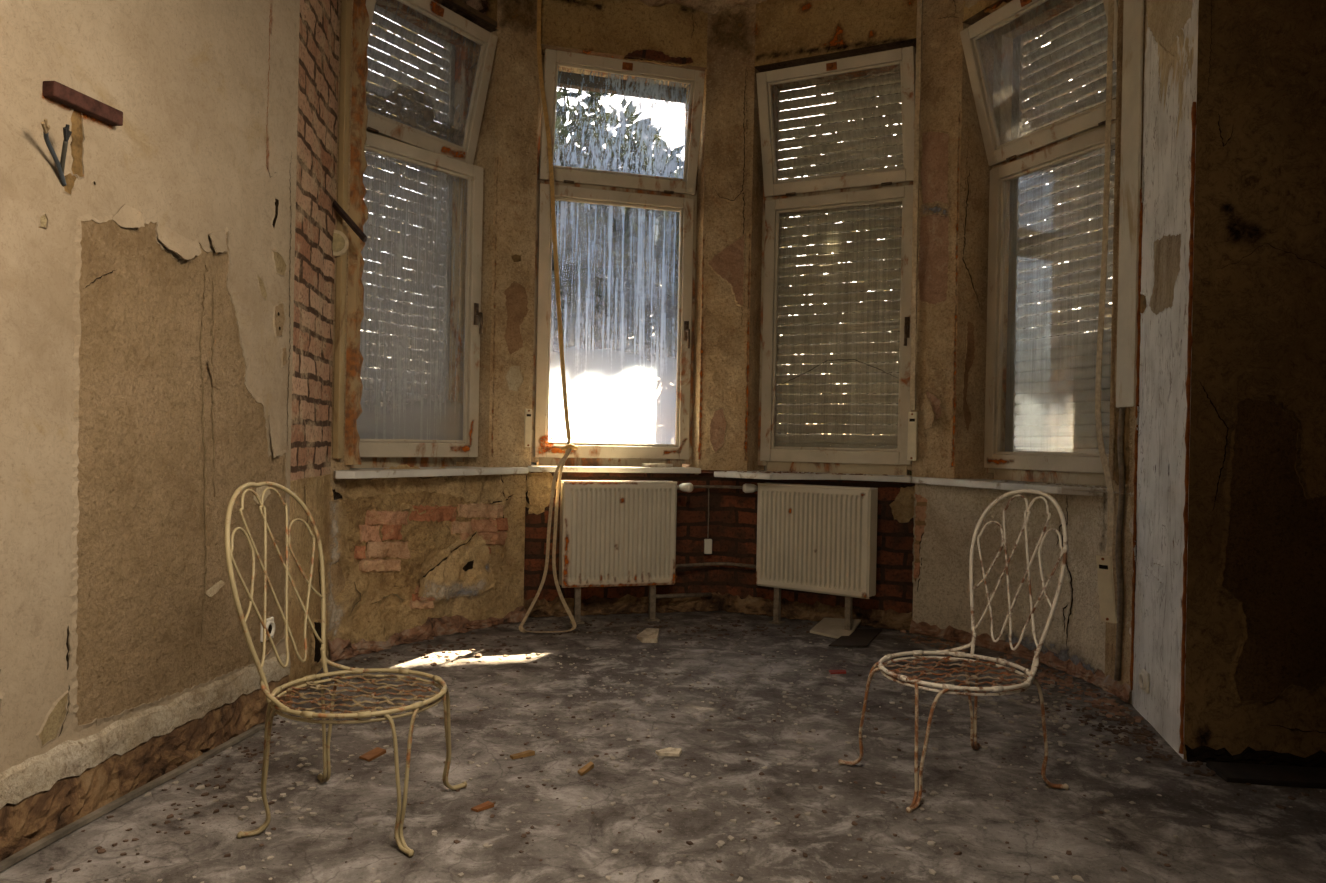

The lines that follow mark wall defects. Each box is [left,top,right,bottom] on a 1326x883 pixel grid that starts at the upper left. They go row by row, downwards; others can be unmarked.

spalling [60,172,77,196]
spalling [271,197,279,231]
peeling [36,204,287,749]
flaking render [330,464,508,617]
crack [1054,496,1073,649]
crack [1131,522,1139,615]